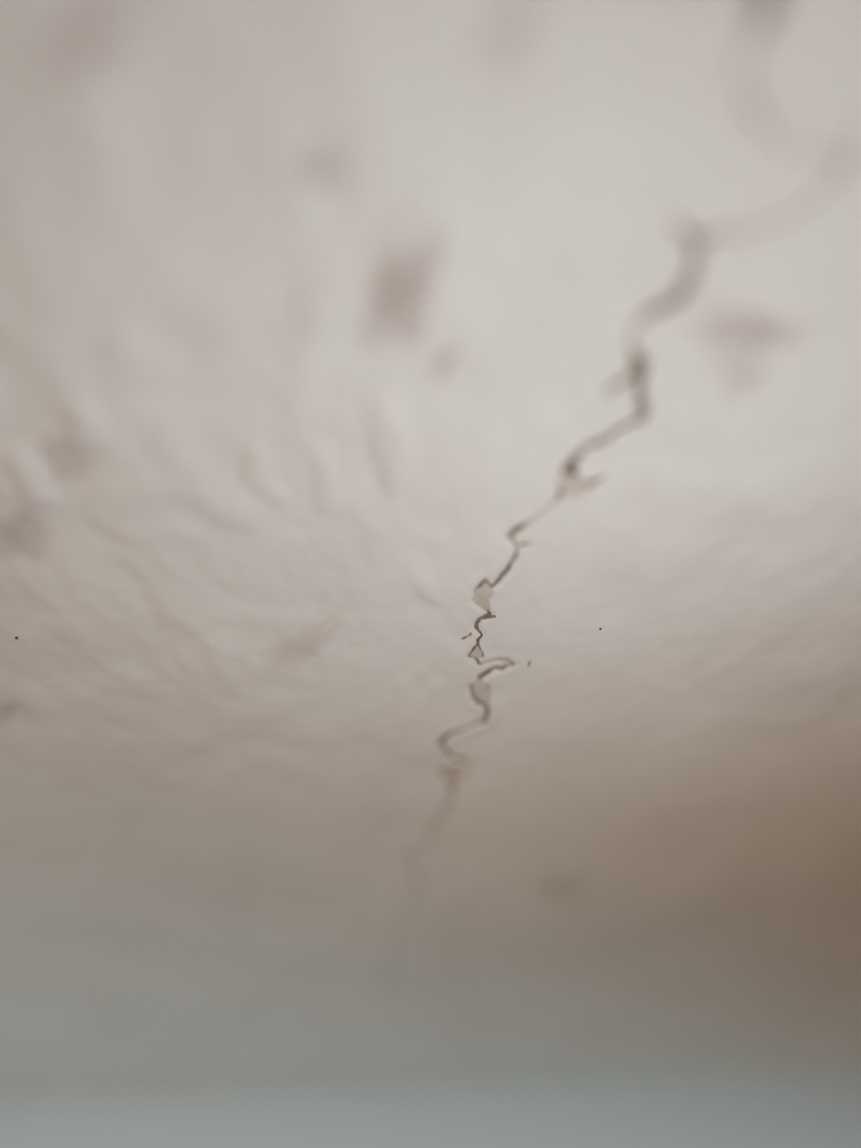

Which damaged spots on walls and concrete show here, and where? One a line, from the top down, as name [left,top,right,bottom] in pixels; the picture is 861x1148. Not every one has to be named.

crack [388,0,861,986]